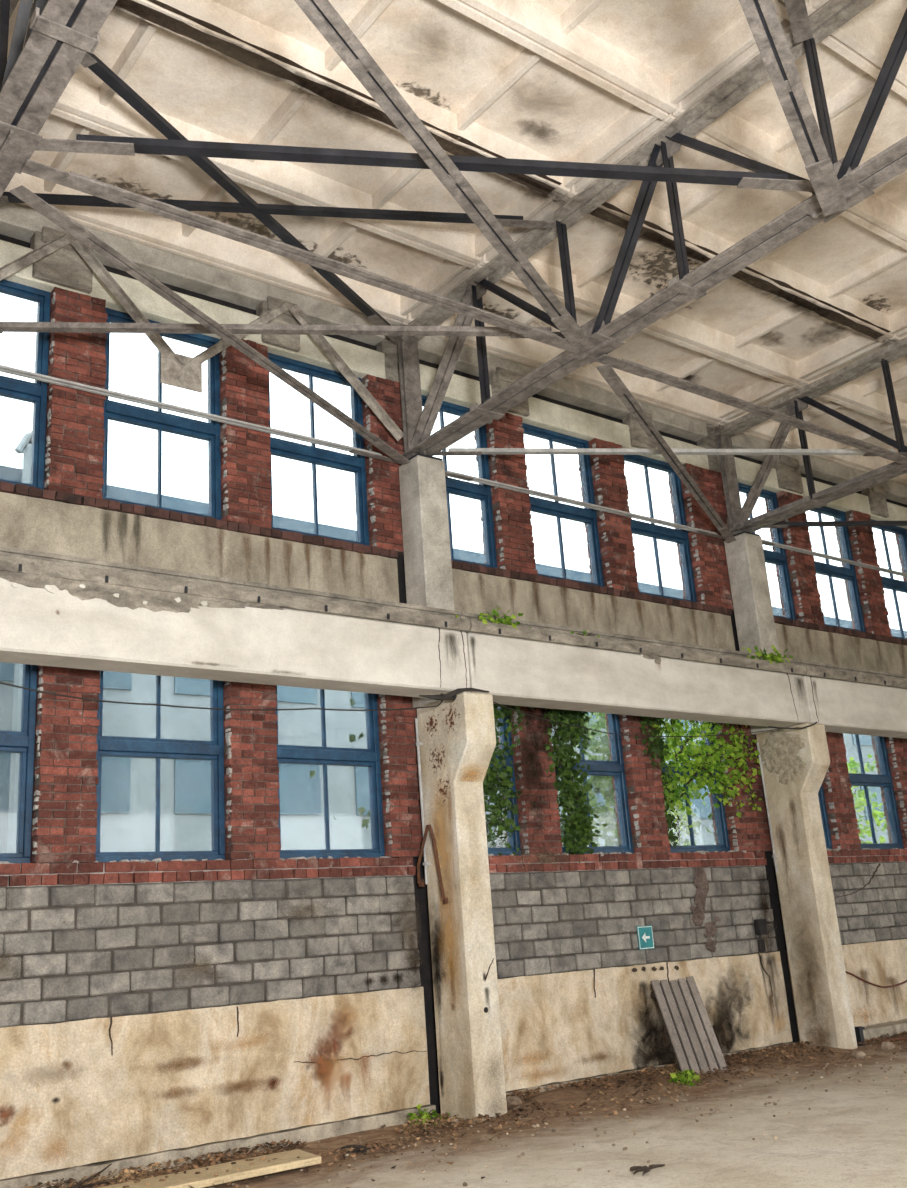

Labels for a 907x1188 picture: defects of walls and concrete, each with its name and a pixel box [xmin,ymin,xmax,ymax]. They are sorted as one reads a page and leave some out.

damp [104,513,140,545]
peeling [0,570,285,613]
damp [169,1059,200,1069]
corrosion [307,1021,351,1082]
crack [295,1050,425,1063]